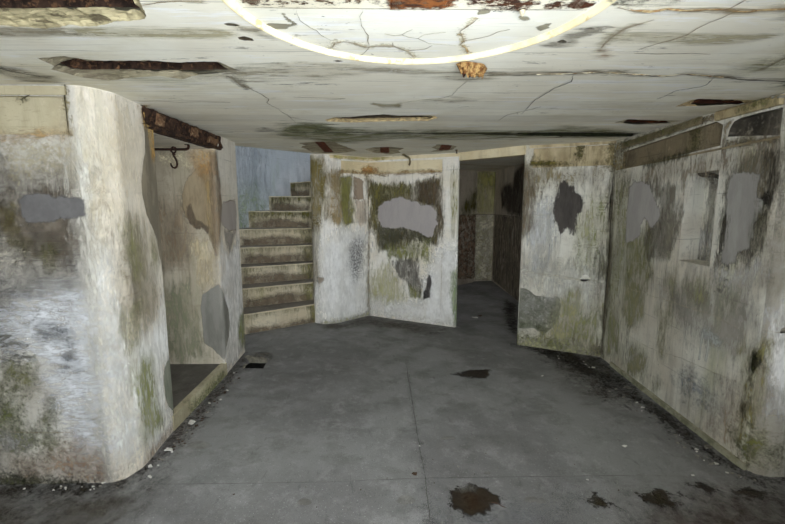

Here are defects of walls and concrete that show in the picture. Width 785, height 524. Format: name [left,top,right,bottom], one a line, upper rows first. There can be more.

spalling [0,0,146,29]
crack [296,8,510,57]
rust [242,0,595,12]
crack [600,0,785,54]
spalling [38,56,248,81]
crack [489,58,785,117]
rust [143,105,166,160]
damp [0,152,92,312]
peeling [142,122,243,400]
peeling [0,114,174,484]
damp [0,334,30,365]
damp [38,322,72,369]